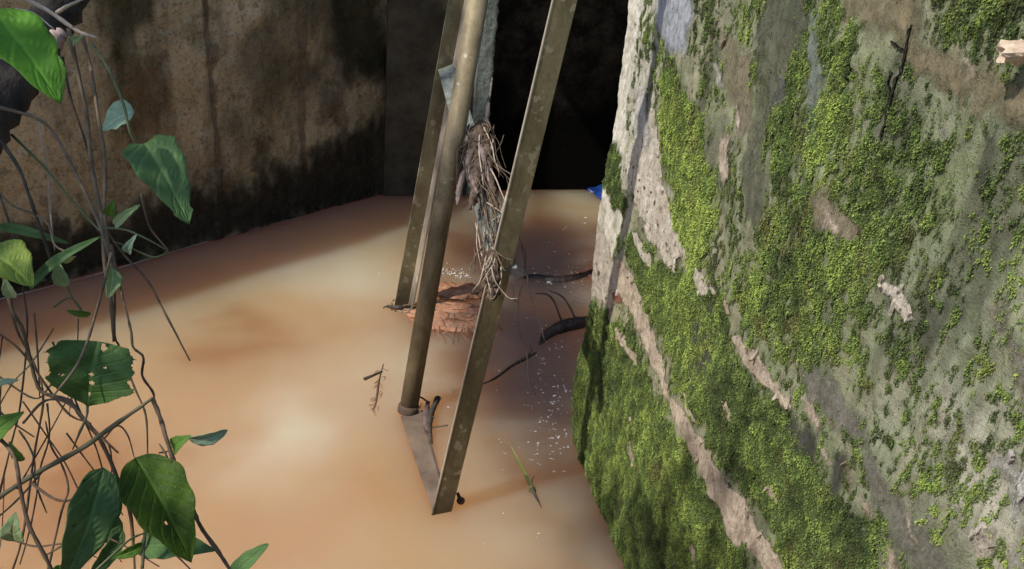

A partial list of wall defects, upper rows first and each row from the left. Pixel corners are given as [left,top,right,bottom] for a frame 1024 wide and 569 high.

crack [879,24,913,141]
peeling [841,0,1024,126]
damp [0,0,385,298]
spalling [625,107,729,314]
peeling [809,190,862,245]
spalling [877,274,914,323]
peeling [591,221,784,569]